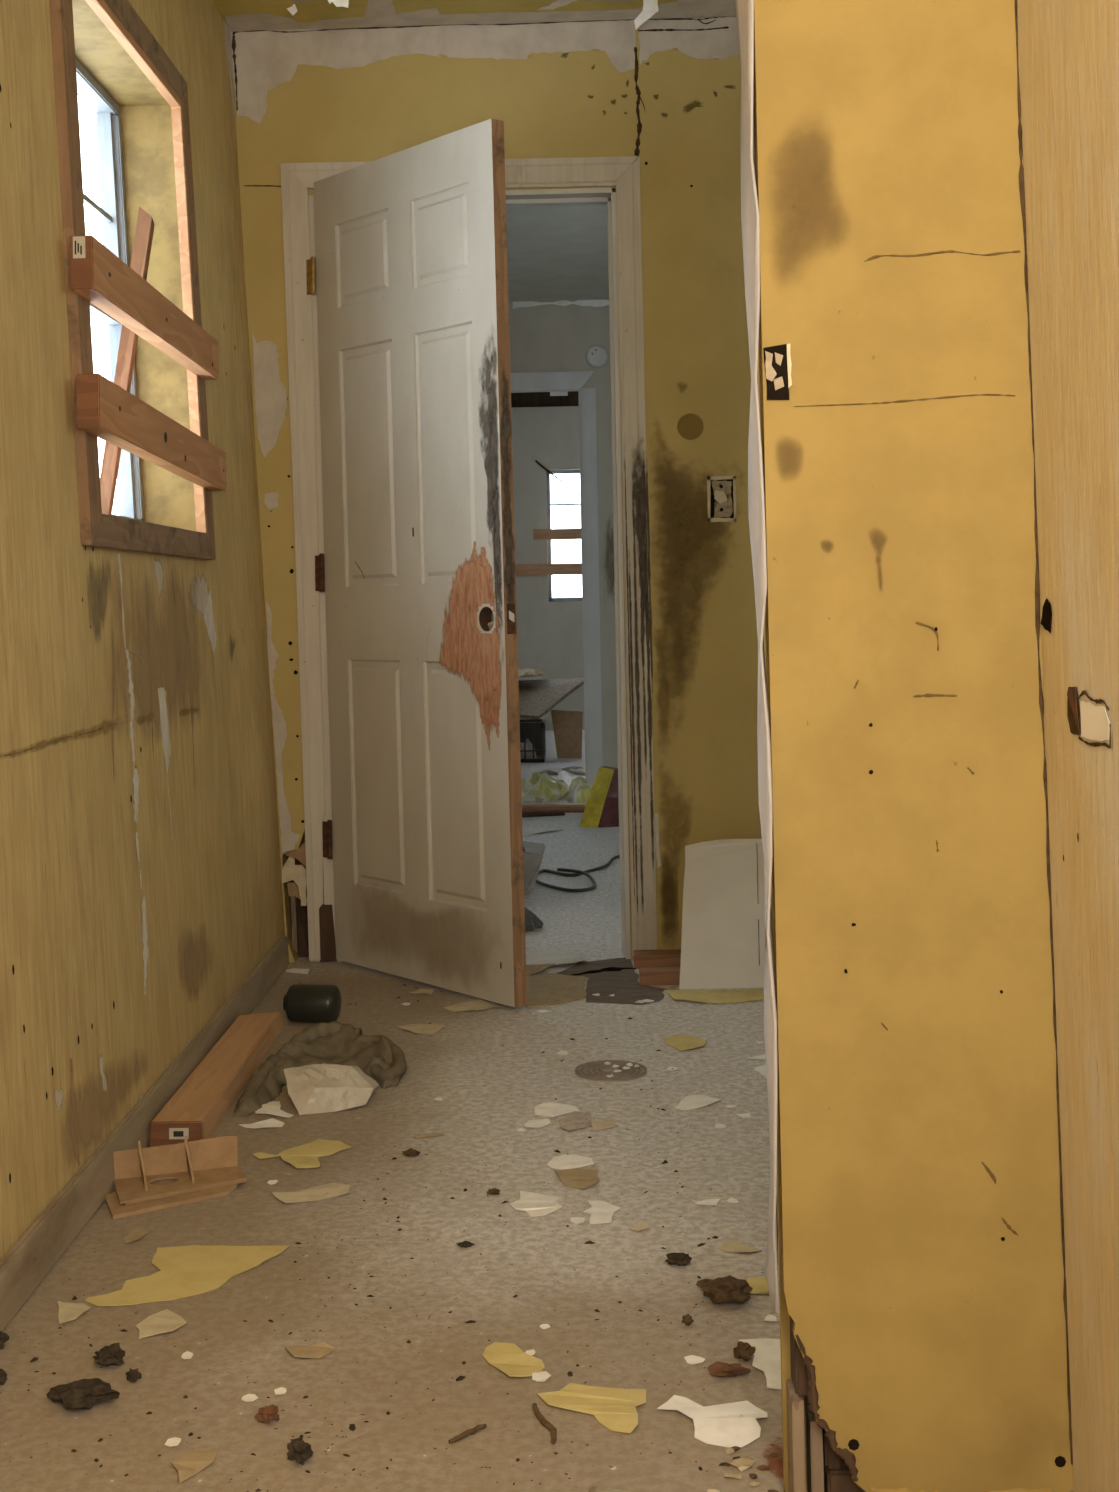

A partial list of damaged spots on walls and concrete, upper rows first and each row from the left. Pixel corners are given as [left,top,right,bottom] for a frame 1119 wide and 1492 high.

crack [229,17,729,156]
damp [783,137,836,260]
damp [677,414,703,440]
crack [9,708,197,757]
peeling [189,573,217,653]
peeling [224,0,779,1313]
damp [605,452,725,927]
crack [793,0,1073,1465]